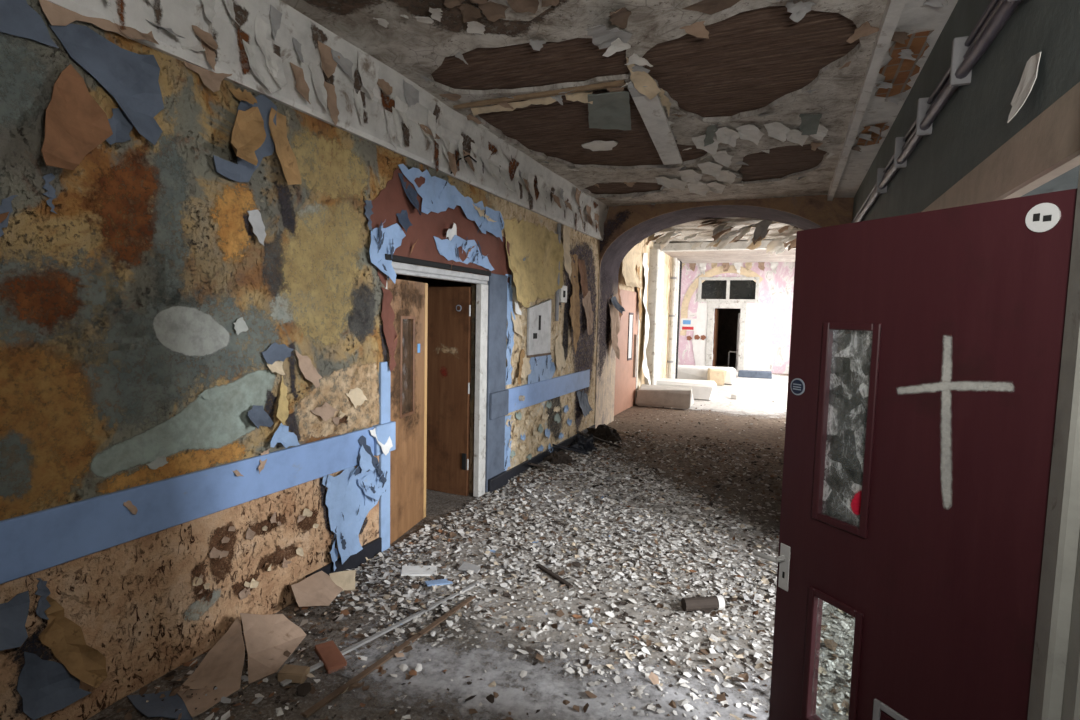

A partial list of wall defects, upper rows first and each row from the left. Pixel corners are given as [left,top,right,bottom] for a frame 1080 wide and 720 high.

peeling [106,0,126,30]
spalling [875,30,934,105]
spalling [851,122,889,152]
spalling [145,0,879,602]
peeling [97,442,246,515]